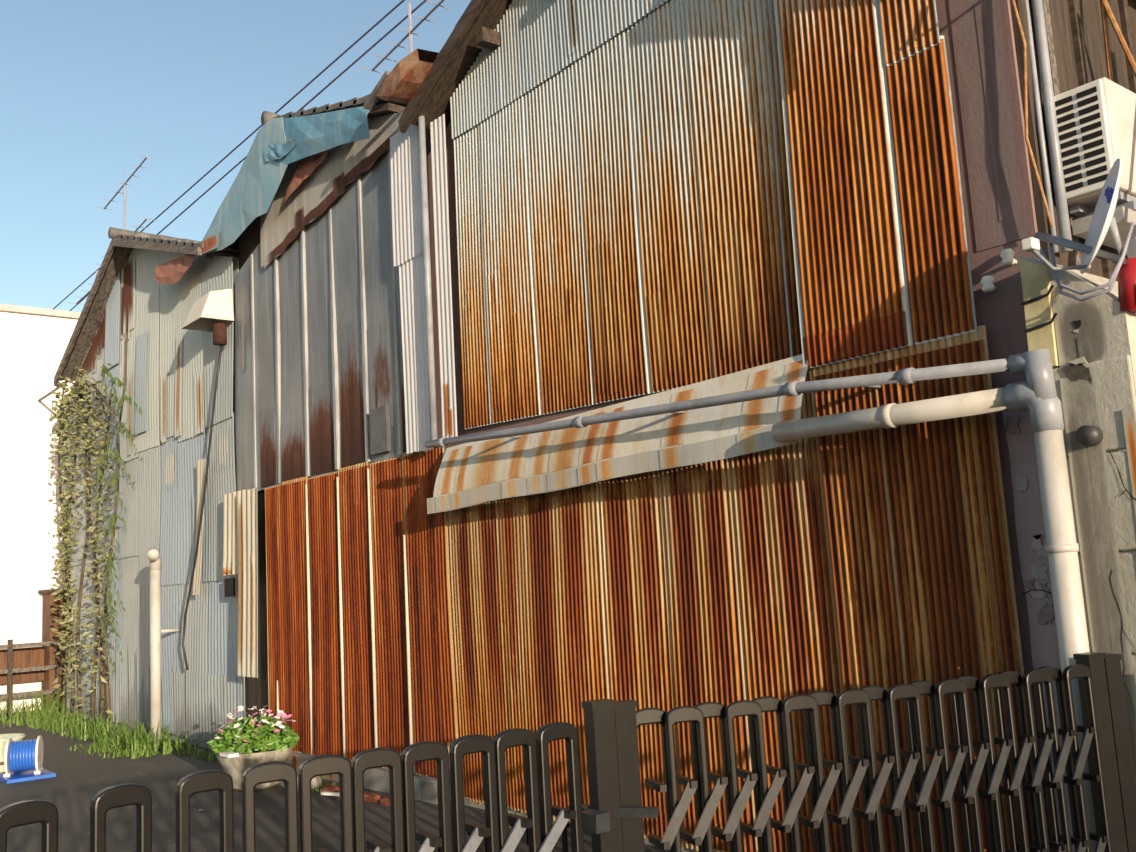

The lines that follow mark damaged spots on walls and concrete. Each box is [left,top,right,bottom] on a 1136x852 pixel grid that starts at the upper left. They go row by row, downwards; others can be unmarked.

corrosion [73,308,106,393]
corrosion [121,259,135,340]
corrosion [161,333,205,443]
corrosion [223,0,1033,852]
corrosion [1122,407,1136,518]
peeling [1002,410,1075,852]